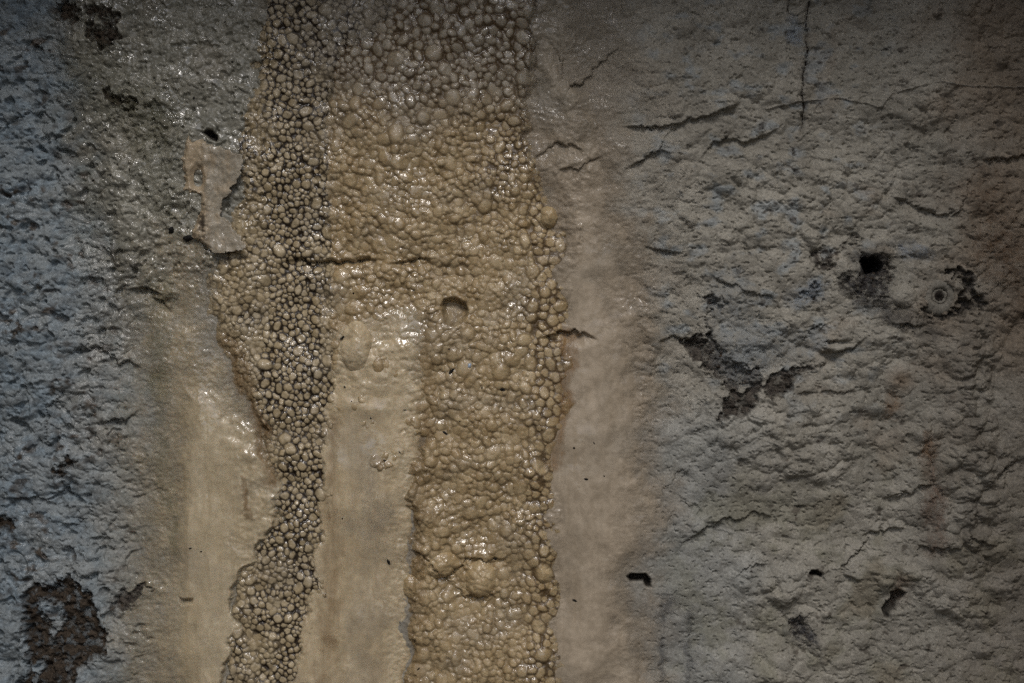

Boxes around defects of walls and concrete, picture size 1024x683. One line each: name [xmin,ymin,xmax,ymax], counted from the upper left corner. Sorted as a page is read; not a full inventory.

crack [778,1,1022,129]
peeling [180,135,246,253]
water stain [65,0,664,683]
spalling [679,333,812,420]
spalling [921,267,987,321]
spalling [21,578,108,683]